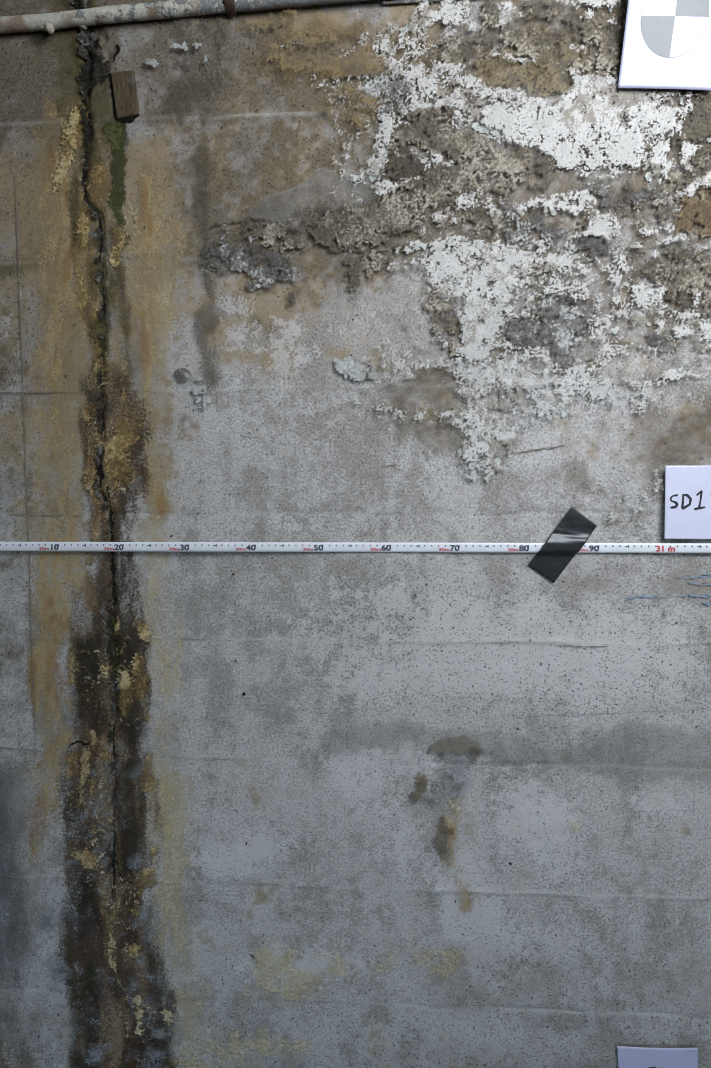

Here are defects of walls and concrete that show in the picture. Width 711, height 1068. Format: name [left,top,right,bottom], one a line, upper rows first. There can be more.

water stain [65,26,92,75]
crack [68,0,140,899]
water stain [0,95,311,1068]
peeling [195,0,711,483]
peeling [557,436,702,540]